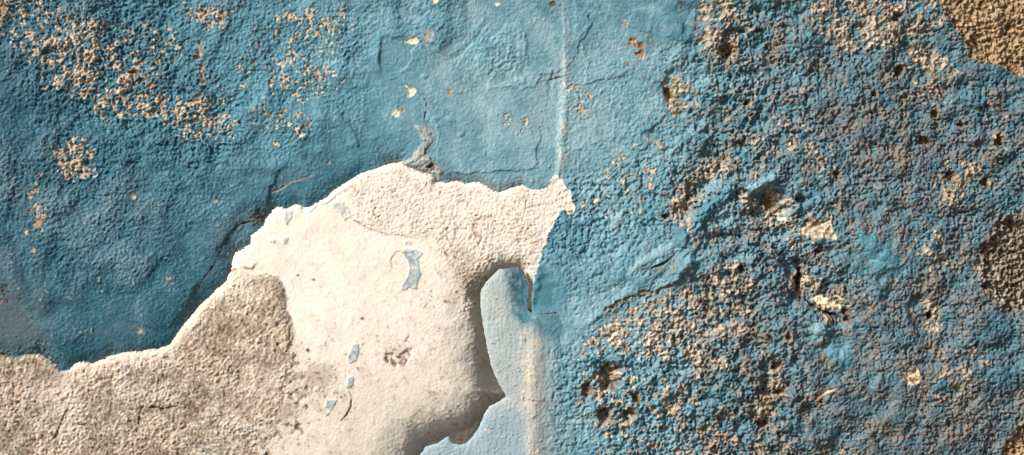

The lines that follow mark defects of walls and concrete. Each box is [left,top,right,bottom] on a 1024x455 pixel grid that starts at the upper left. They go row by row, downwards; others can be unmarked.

peeling [0,0,240,149]
peeling [234,4,356,149]
spalling [810,0,1024,105]
peeling [924,102,1009,208]
crack [189,222,258,309]
flaking render [0,136,874,455]
peeling [909,297,943,337]
peeling [915,229,948,272]
spalling [972,214,1024,315]
peeling [901,344,992,427]
spalling [1002,419,1024,455]